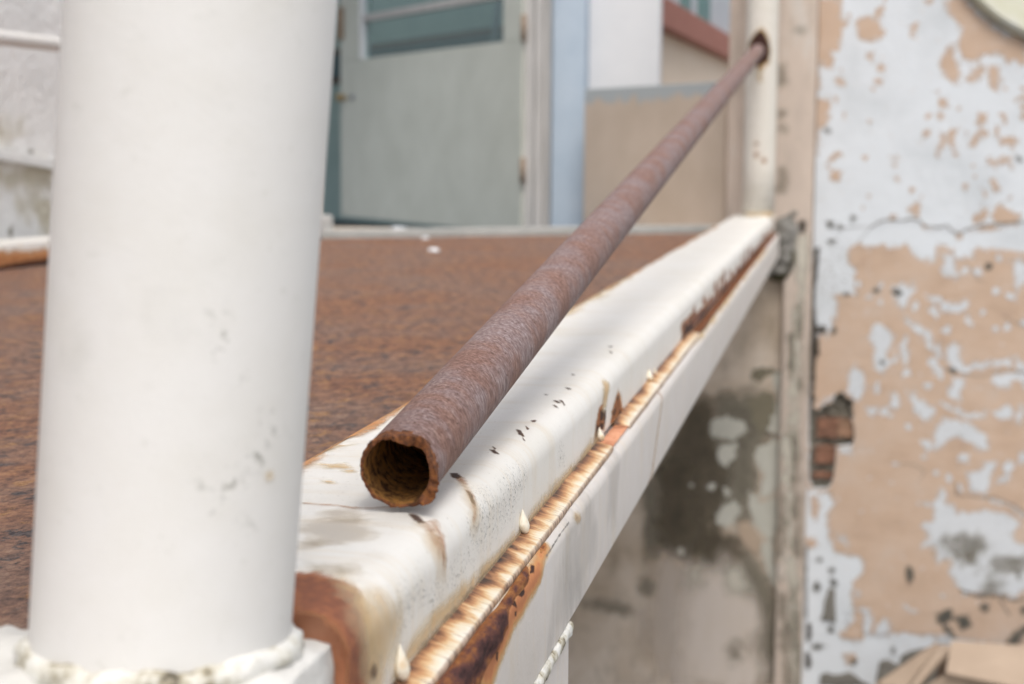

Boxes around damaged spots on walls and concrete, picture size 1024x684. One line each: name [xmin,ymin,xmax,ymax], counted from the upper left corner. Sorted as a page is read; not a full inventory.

rust [595,381,624,440]
peeling [706,0,1024,684]
rust [293,571,381,684]
rust [481,544,550,684]
damp [643,390,823,684]
damp [813,558,837,591]